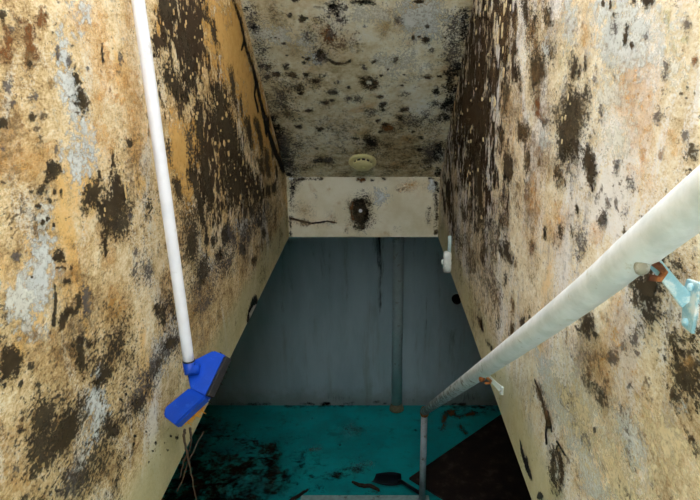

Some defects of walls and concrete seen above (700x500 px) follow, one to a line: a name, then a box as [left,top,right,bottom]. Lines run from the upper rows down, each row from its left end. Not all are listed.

water stain [0,0,182,500]
crack [290,217,336,226]
water stain [151,0,699,351]